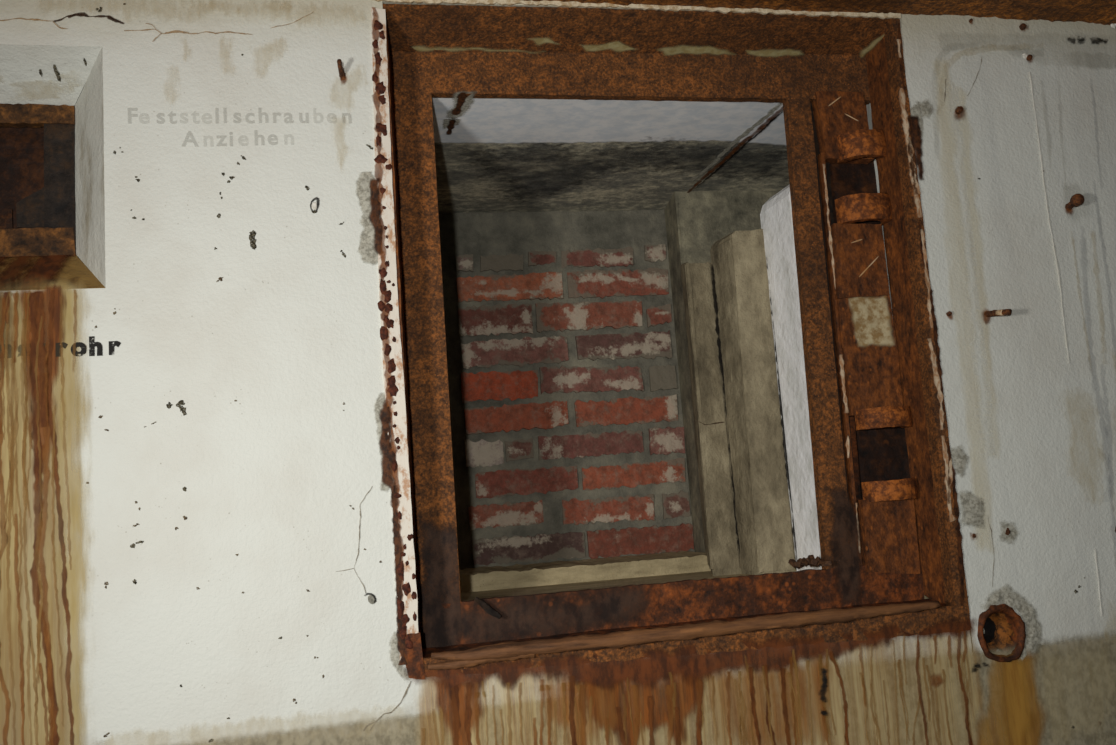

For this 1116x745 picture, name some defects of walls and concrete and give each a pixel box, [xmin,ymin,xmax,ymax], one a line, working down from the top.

crack [0,13,309,41]
rust [443,92,475,135]
rust [687,103,783,193]
peeling [899,88,933,328]
rust [927,287,952,410]
peeling [929,342,984,526]
rust [0,255,85,745]
rust [947,446,973,605]
rust [421,620,1041,745]